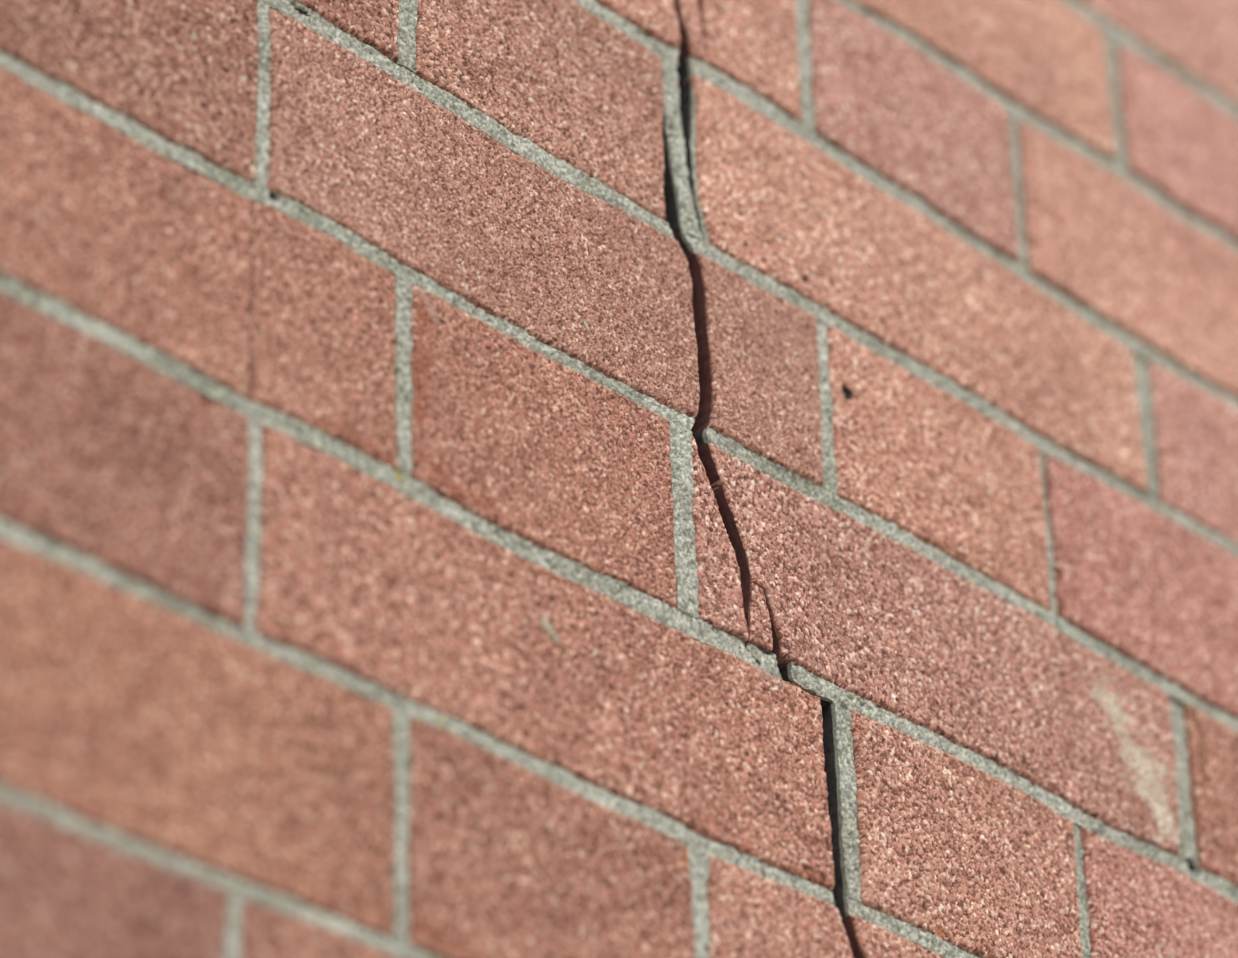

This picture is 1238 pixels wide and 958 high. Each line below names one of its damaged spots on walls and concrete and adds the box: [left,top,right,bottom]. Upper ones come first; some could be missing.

crack [662,0,864,958]